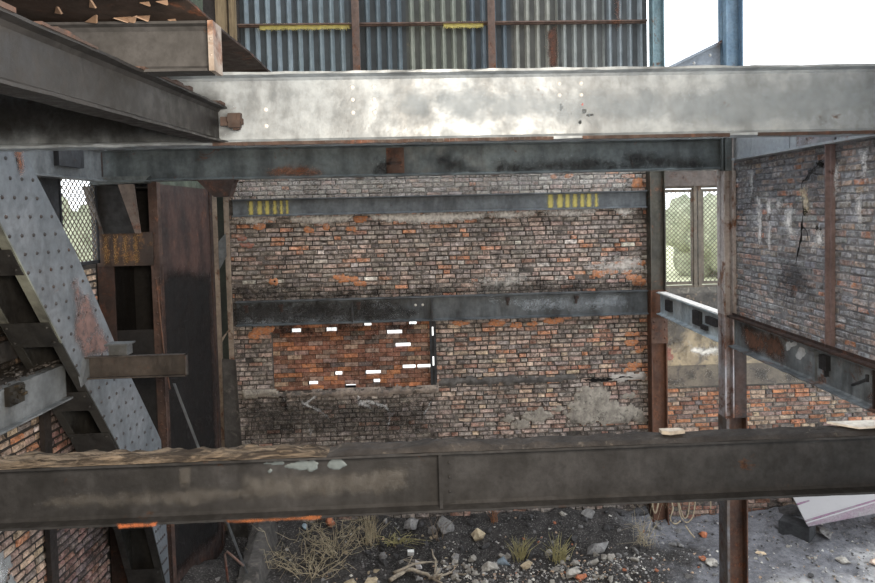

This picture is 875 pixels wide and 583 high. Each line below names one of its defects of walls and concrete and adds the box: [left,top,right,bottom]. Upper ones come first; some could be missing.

corrosion [547,29,558,67]
crack [795,160,824,265]
spalling [610,332,647,382]
corrosion [743,326,785,361]
peeling [240,373,648,429]
peeling [0,551,16,583]